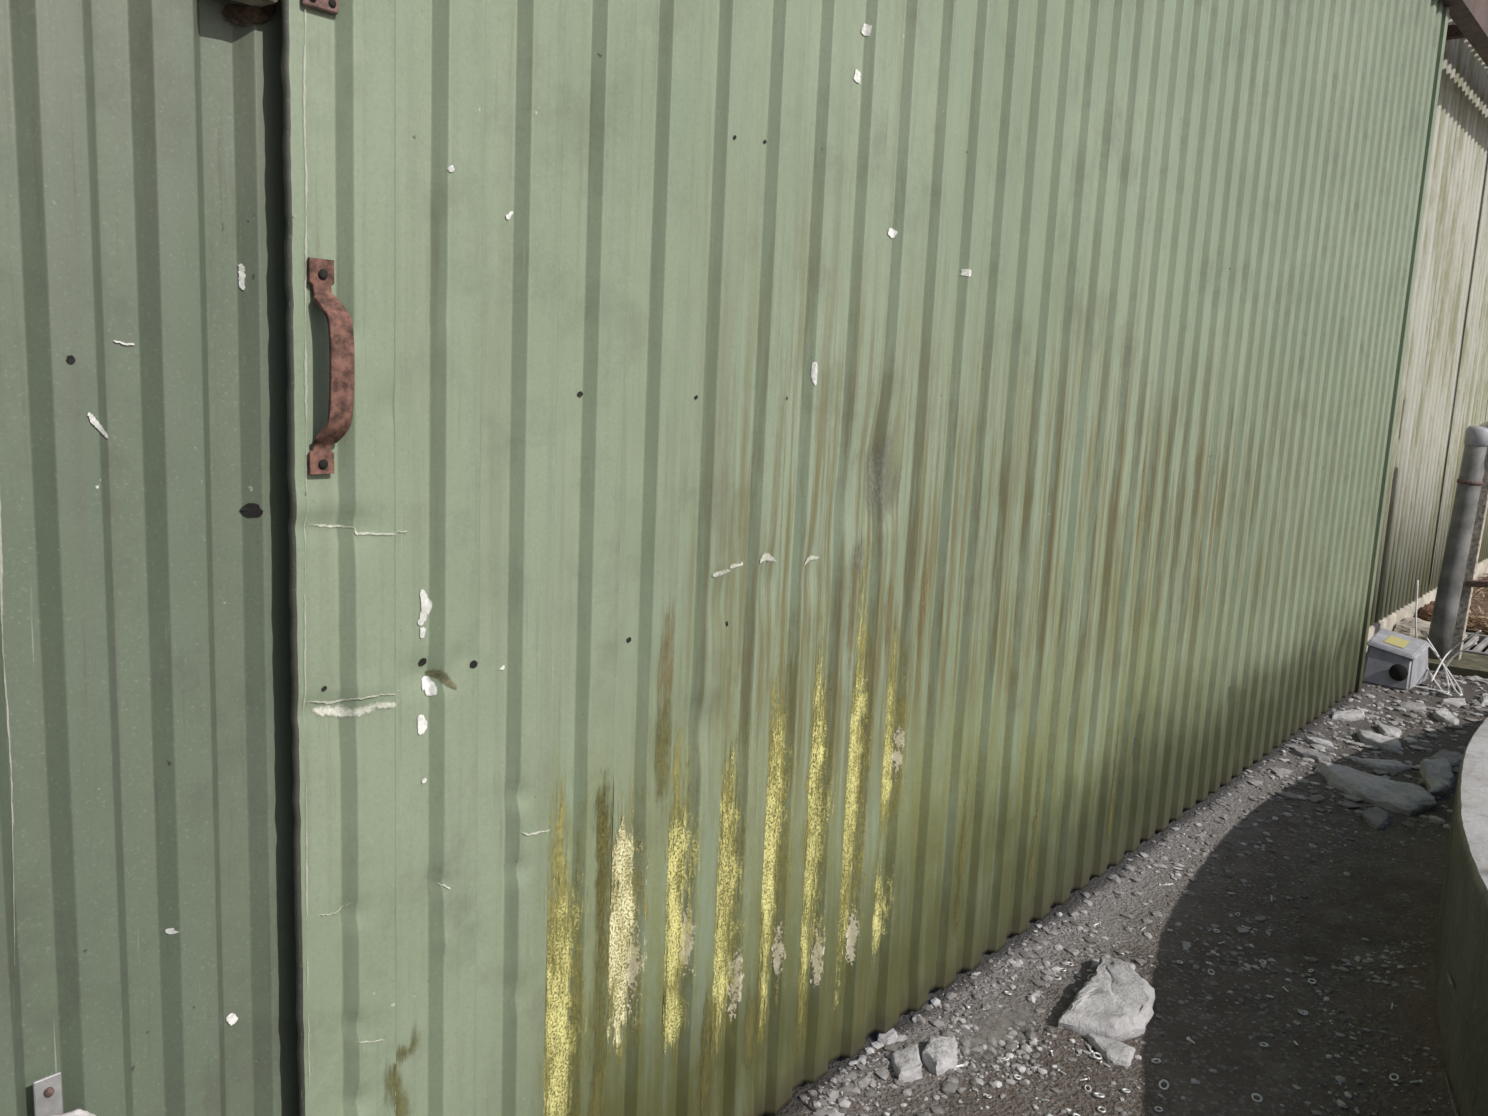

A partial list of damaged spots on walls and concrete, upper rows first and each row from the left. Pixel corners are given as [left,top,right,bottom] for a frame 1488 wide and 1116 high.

peeling [417,589,432,638]
peeling [422,676,437,696]
peeling [417,715,427,735]
damp [655,561,906,1115]
damp [543,784,647,1116]